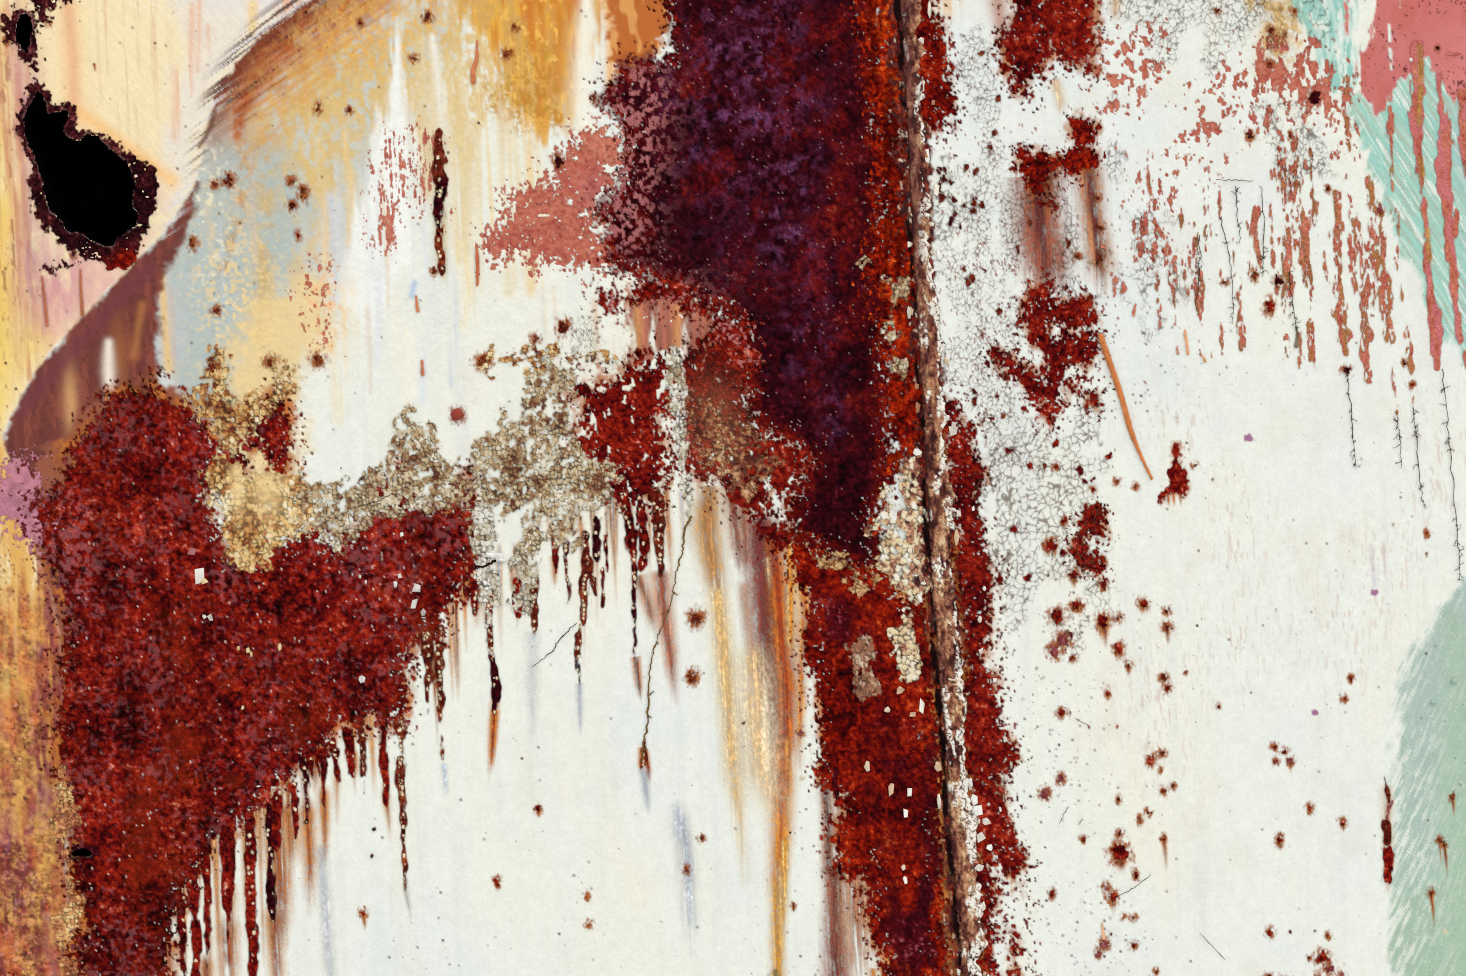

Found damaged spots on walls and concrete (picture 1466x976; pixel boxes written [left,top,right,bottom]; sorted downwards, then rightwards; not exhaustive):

peeling [1144,150,1156,208]
corrosion [973,0,1119,436]
peeling [1151,40,1466,415]
peeling [183,342,625,629]
corrosion [17,0,1056,976]
corrosion [1158,670,1188,694]
corrosion [1038,772,1066,801]
corrosion [1145,748,1177,796]
corrosion [1109,807,1153,881]
corrosion [1095,882,1138,959]